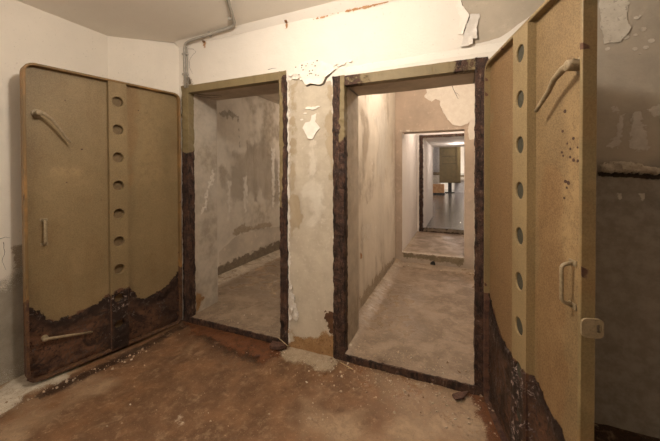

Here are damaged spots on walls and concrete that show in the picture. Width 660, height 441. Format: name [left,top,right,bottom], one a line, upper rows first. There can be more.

peeling [454,0,480,47]
peeling [599,0,647,51]
water stain [218,110,280,221]
flaking render [287,59,352,347]
peeling [424,84,475,140]
water stain [218,241,280,275]
corrosion [24,272,333,381]
corrosion [467,294,565,441]